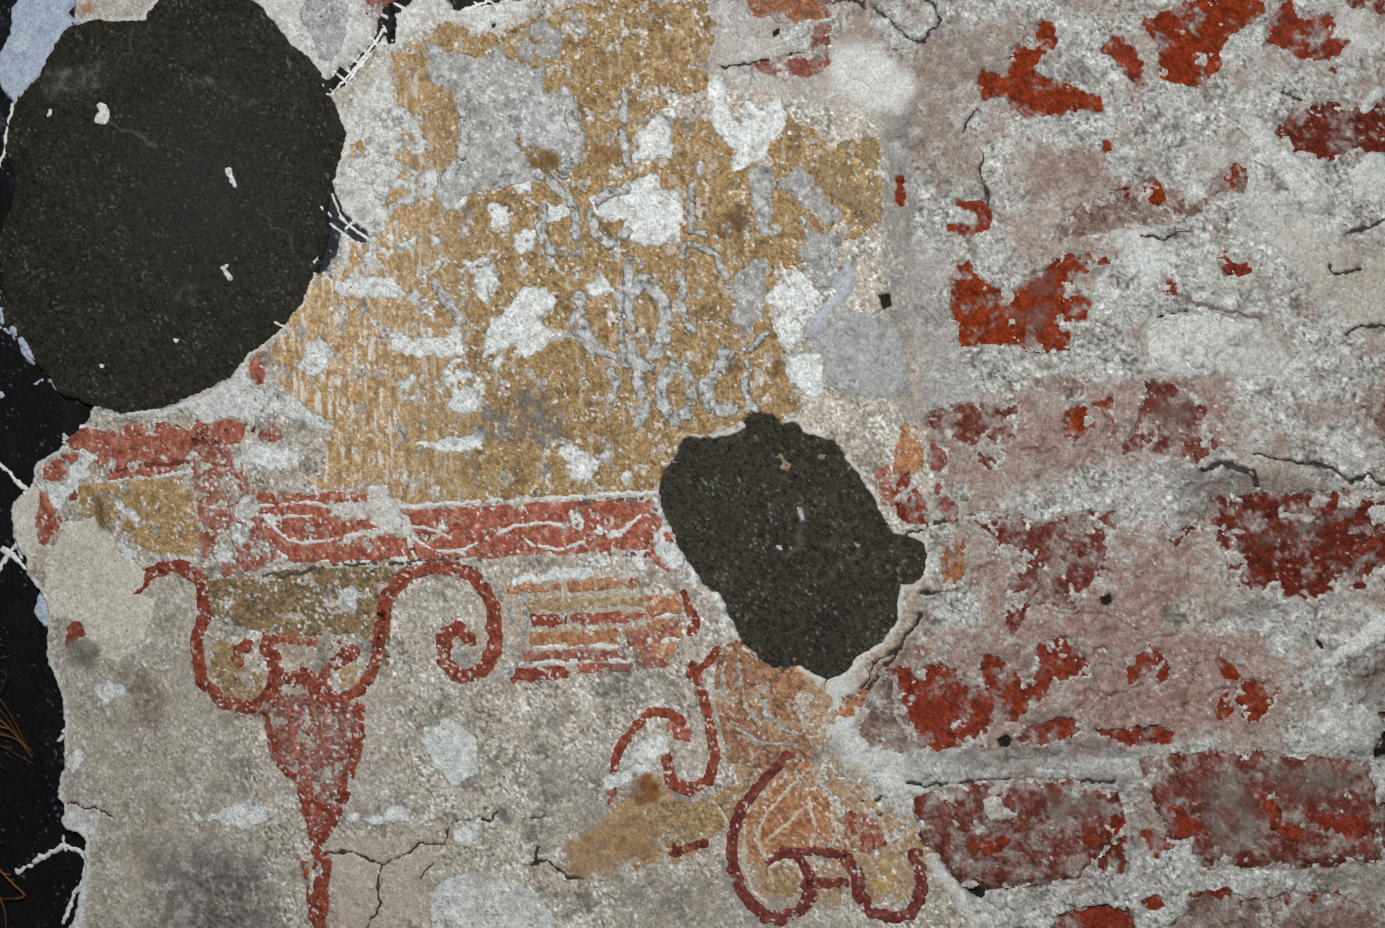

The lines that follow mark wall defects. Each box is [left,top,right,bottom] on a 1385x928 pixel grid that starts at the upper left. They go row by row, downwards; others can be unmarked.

crack [831,0,942,44]
spalling [977,21,1103,119]
spalling [1101,0,1385,88]
spalling [1275,99,1385,163]
peeling [313,0,589,455]
peeling [708,75,850,404]
spalling [946,163,1258,353]
spalling [891,371,1119,639]
spalling [1165,486,1385,603]
crack [1199,452,1385,488]
flaking render [856,635,1385,928]
crack [328,810,584,928]